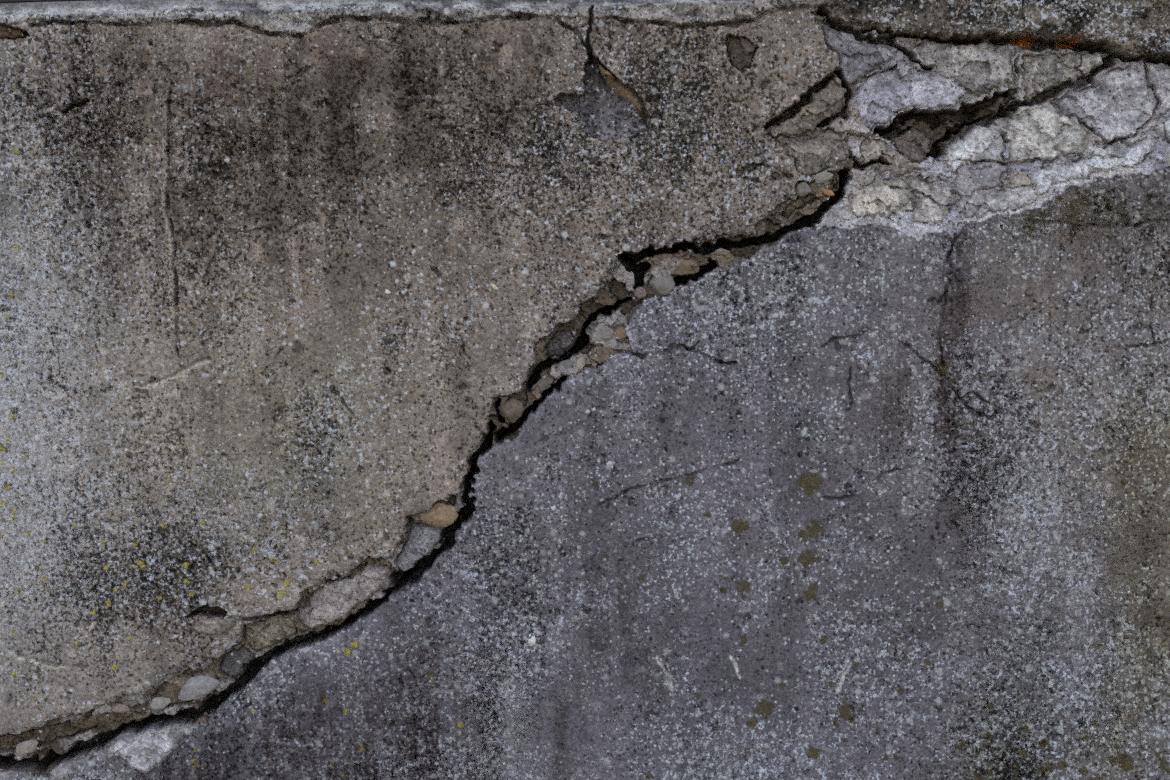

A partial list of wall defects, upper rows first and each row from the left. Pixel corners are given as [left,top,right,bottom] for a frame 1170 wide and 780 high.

crack [28,8,586,50]
crack [609,3,826,30]
crack [1020,0,1028,27]
crack [91,58,115,154]
spalling [735,10,1170,241]
crack [1003,217,1170,229]
crack [818,235,1027,420]
crack [1089,273,1170,354]
crack [0,87,854,780]
crack [821,465,912,501]